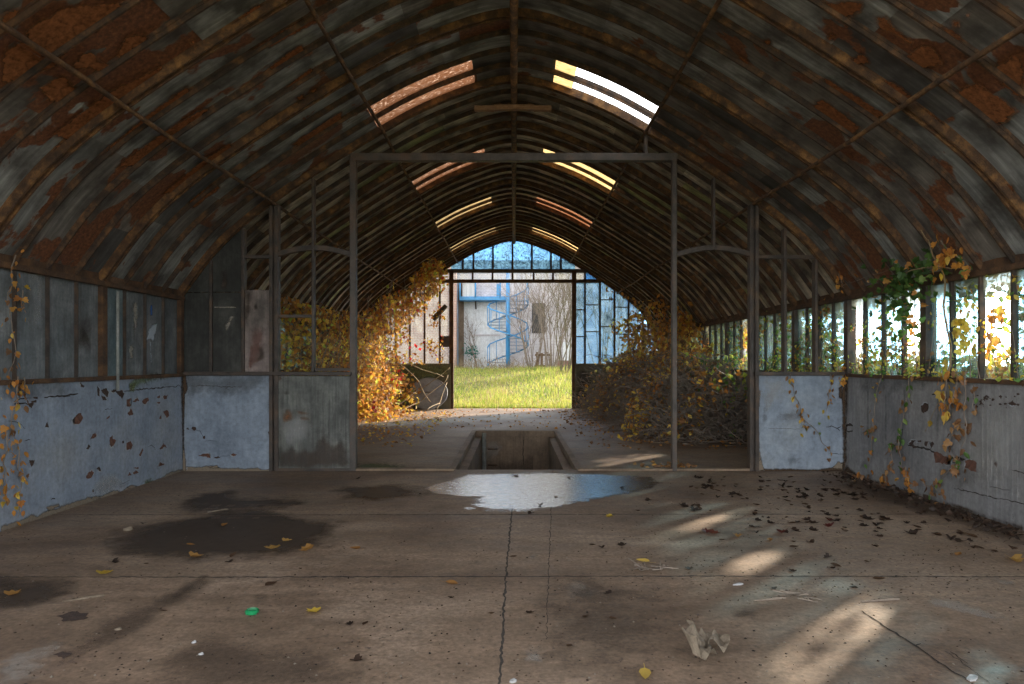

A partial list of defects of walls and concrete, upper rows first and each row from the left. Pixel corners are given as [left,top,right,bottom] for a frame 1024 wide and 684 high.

corrosion [1,2,121,102]
corrosion [958,53,1024,128]
flaking render [97,386,169,419]
flaking render [908,439,977,472]
damp [115,491,330,560]
crack [862,611,986,680]